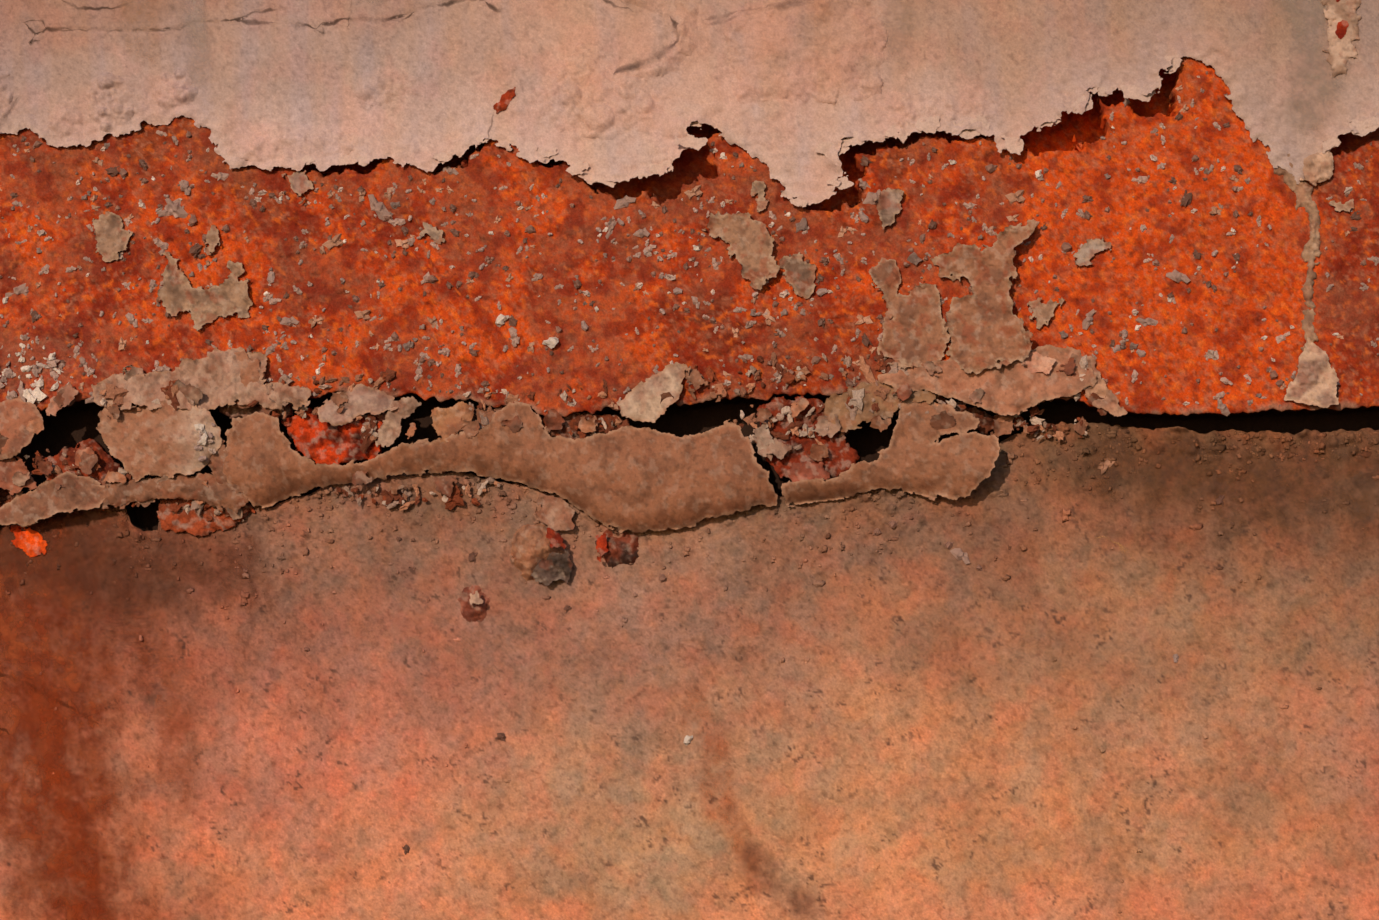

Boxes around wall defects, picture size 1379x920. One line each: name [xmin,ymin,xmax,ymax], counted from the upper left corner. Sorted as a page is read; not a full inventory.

spalling [1320,0,1362,78]
spalling [493,87,516,114]
peeling [1071,79,1160,111]
peeling [649,118,708,174]
peeling [815,131,867,158]
peeling [884,115,1024,155]
peeling [1299,116,1379,186]
peeling [826,172,854,190]
rust [0,56,1379,421]
peeling [0,344,1128,537]
rust [595,533,609,562]
rust [0,523,131,920]